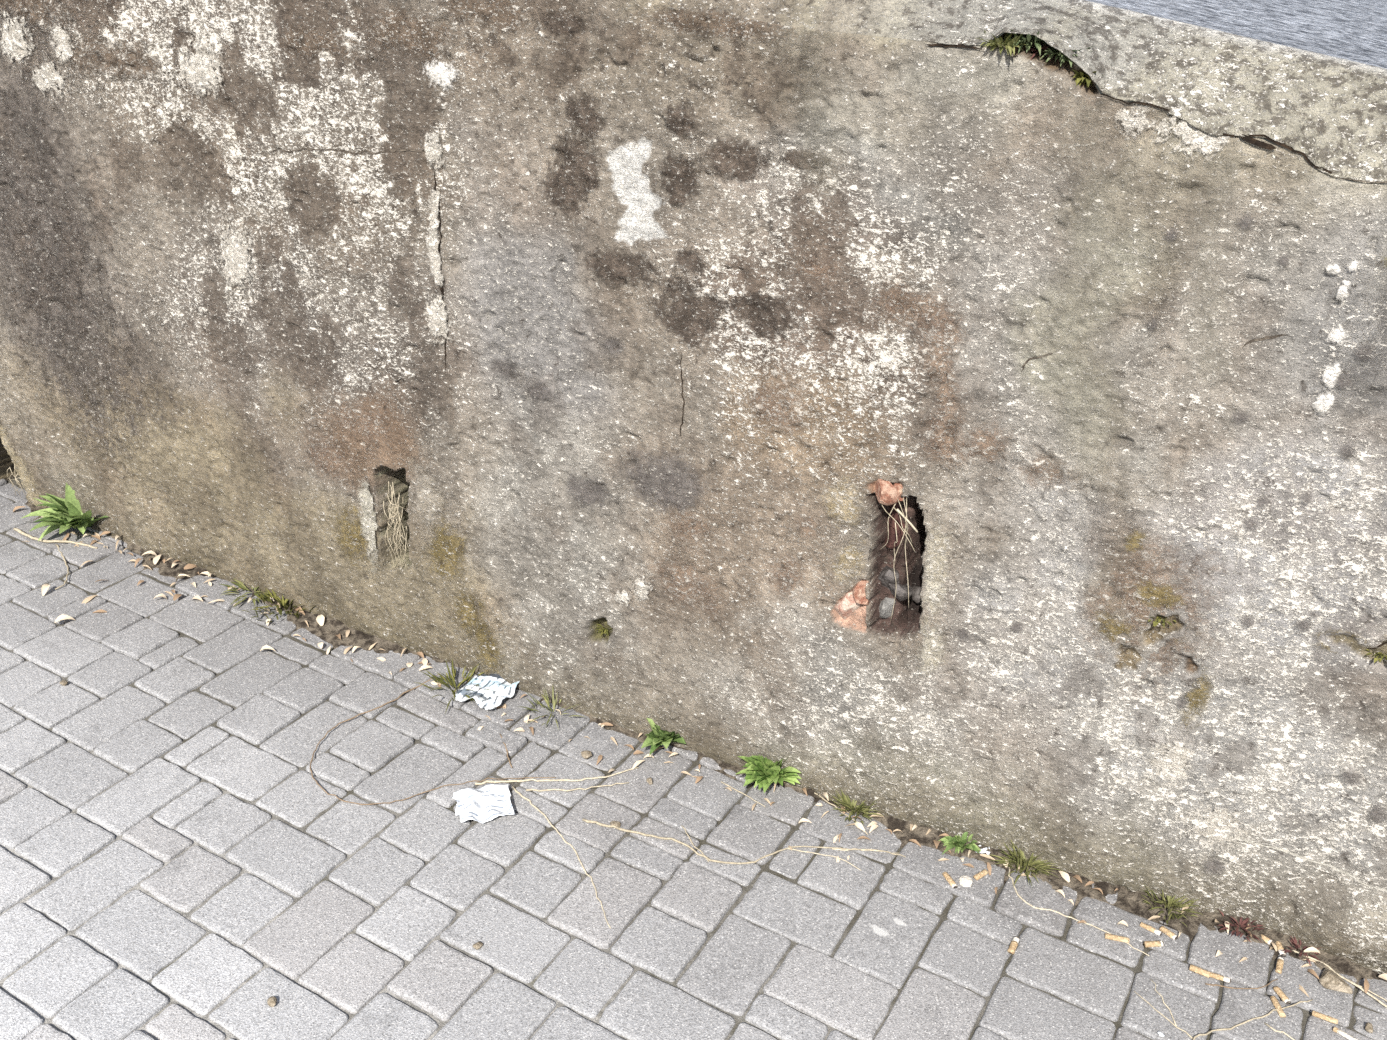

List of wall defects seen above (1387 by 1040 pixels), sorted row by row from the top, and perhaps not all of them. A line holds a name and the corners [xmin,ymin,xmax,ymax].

efflorescence [179,33,228,102]
leakage [371,0,521,90]
crack [925,43,985,51]
crack [1100,94,1169,111]
leakage [654,138,831,205]
crack [1222,133,1387,183]
leakage [0,0,172,456]
efflorescence [214,216,257,302]
crack [270,148,448,370]
leakage [584,247,802,354]
peeling [827,476,906,524]
spalling [827,545,867,636]